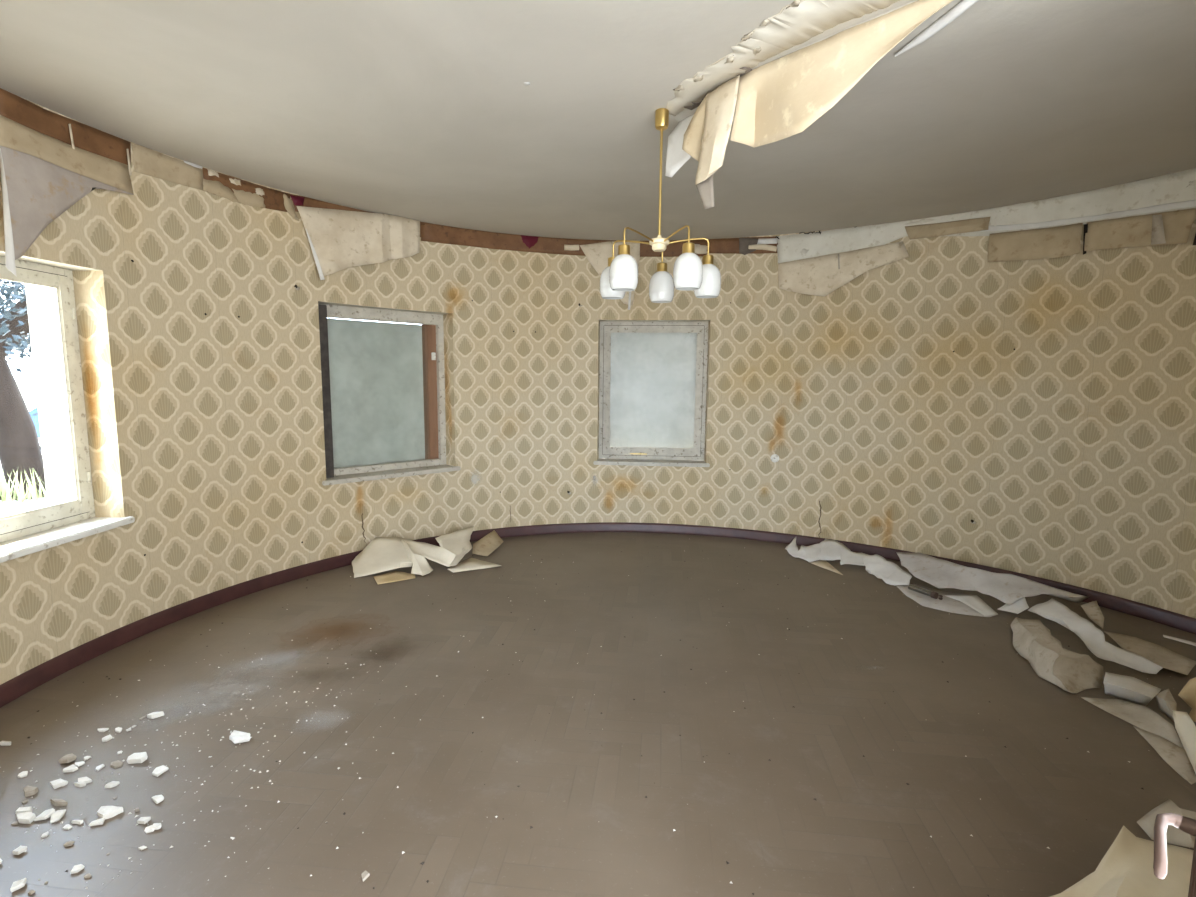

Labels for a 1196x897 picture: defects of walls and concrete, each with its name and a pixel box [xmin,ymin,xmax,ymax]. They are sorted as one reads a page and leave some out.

peeling [0,88,204,277]
peeling [290,194,425,280]
peeling [564,240,640,277]
flaking render [777,168,1196,297]